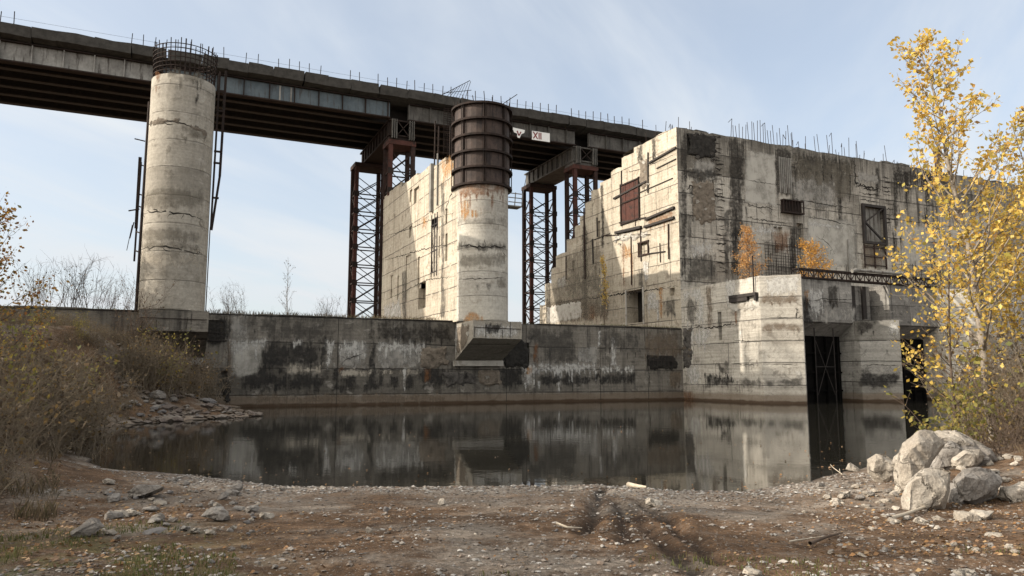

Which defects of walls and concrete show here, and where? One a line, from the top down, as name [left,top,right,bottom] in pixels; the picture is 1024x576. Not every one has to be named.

crack [141,209,202,254]
leakage [208,183,458,395]
crack [385,191,506,300]
corrosion [460,184,504,217]
leakage [639,135,879,352]
leakage [891,166,949,269]